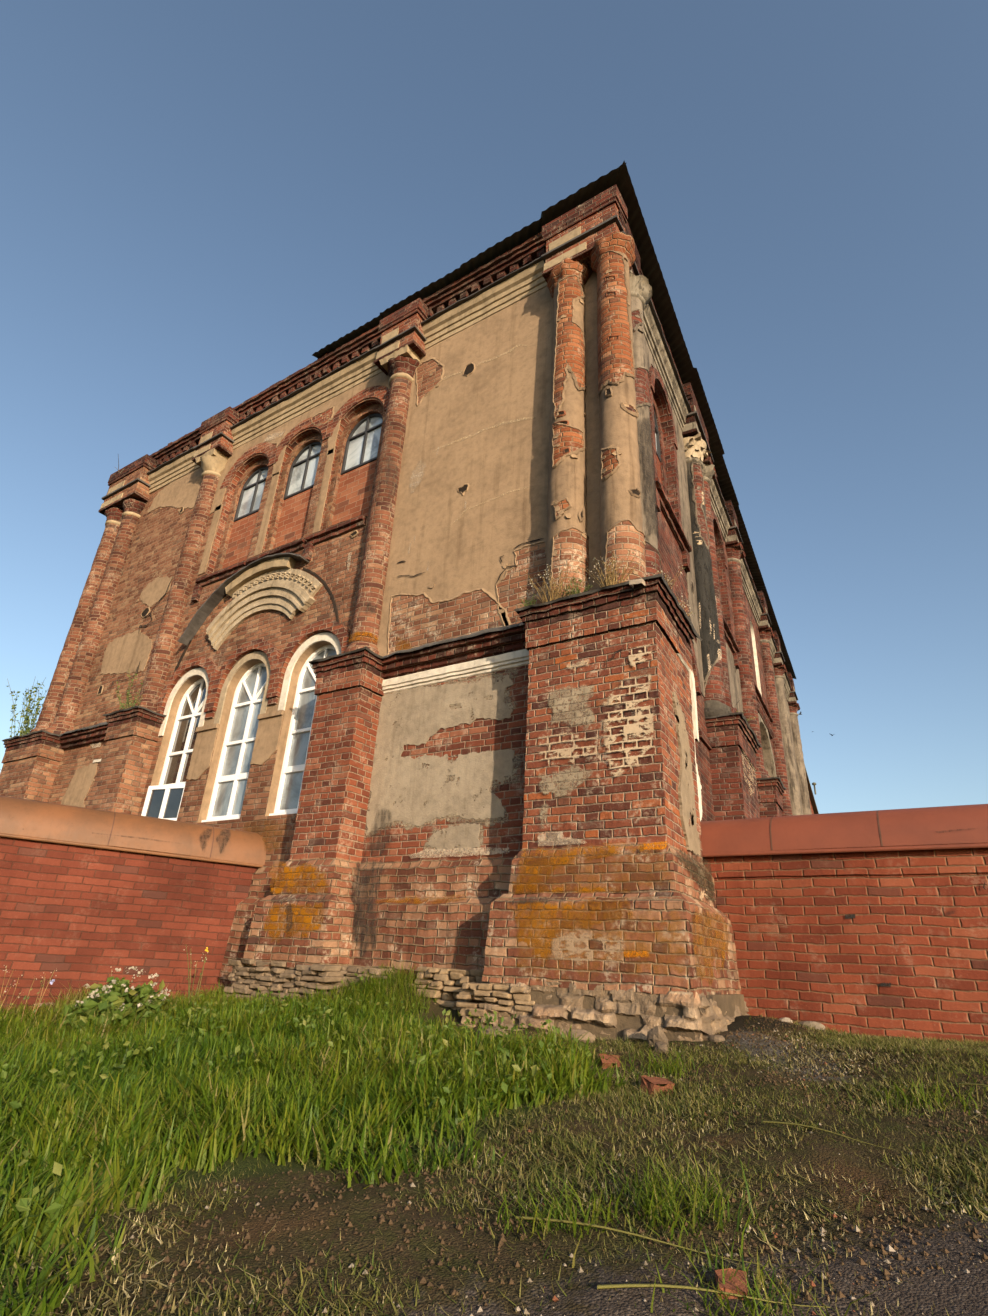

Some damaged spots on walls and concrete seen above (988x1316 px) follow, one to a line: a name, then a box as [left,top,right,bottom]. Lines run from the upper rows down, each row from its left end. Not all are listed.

flaking render [551,250,651,469]
flaking render [601,444,622,481]
flaking render [97,576,174,695]
flaking render [386,497,661,658]
water stain [687,475,722,696]
flaking render [364,669,520,853]
flaking render [540,766,593,828]
flaking render [548,685,596,727]
flaking render [672,691,702,856]
water stain [679,849,714,902]
water stain [553,933,623,965]